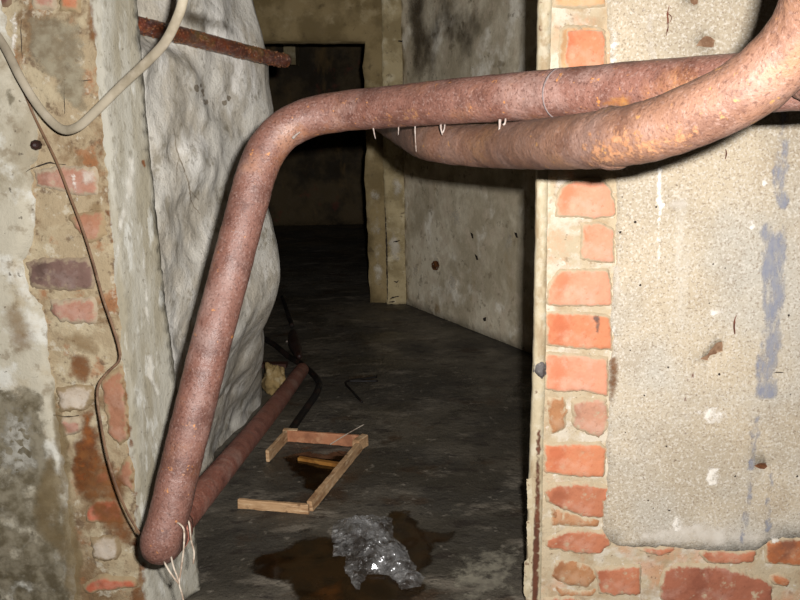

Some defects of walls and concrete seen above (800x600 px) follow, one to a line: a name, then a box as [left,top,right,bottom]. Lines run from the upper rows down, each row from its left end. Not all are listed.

spalling [550,0,611,69]
spalling [1,0,143,600]
spalling [527,169,800,600]
leakage [0,389,69,600]
corrosion [532,431,540,600]